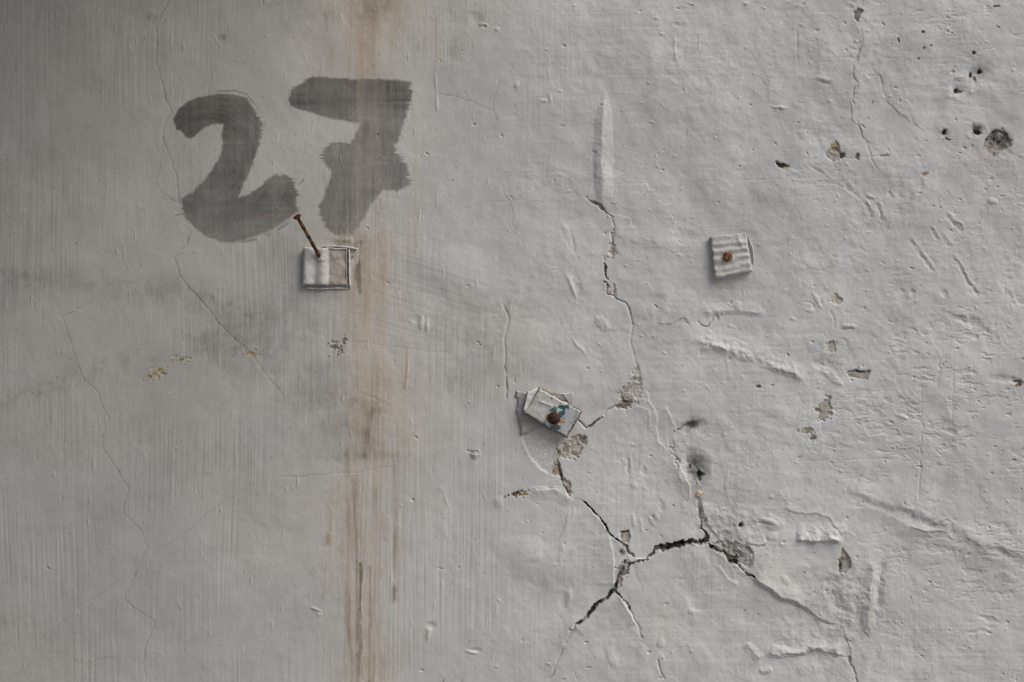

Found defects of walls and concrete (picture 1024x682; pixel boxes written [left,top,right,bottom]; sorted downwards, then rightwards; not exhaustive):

peeling [826,141,859,162]
spalling [971,123,1011,155]
crack [603,263,631,314]
peeling [326,338,348,358]
flaking render [616,365,642,409]
peeling [796,395,832,440]
peeling [507,431,587,510]
crack [560,468,755,625]
peeling [838,549,851,573]